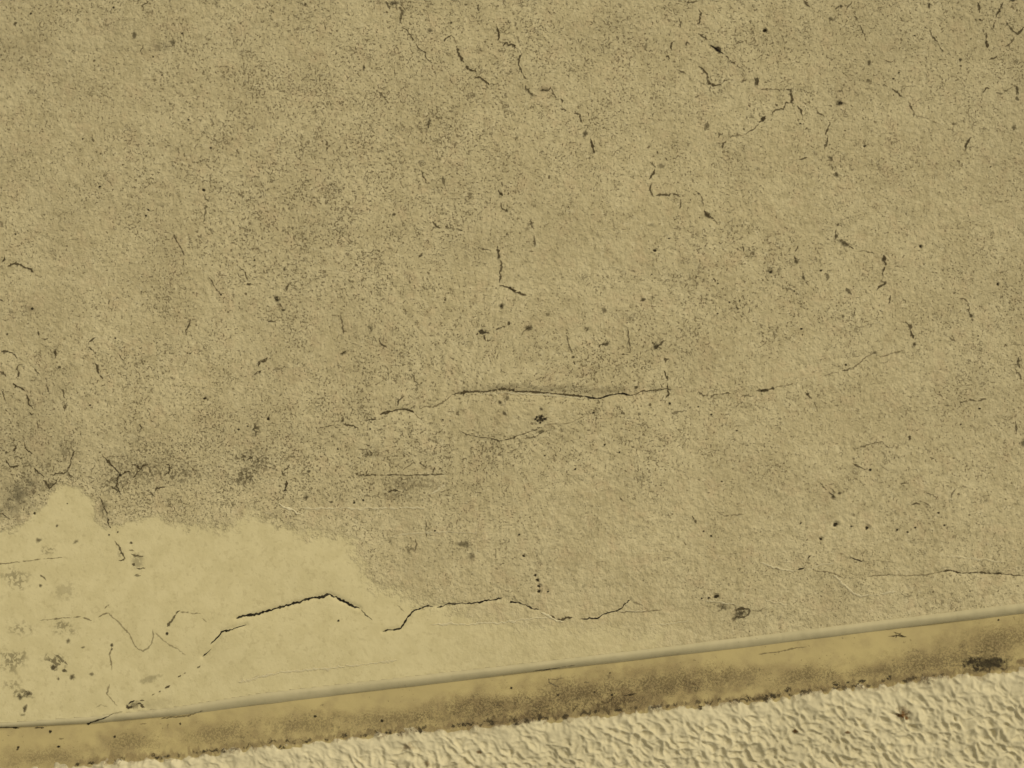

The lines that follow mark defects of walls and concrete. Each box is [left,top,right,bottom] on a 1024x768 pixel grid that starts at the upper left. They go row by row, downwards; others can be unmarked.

crack [320,358,671,441]
crack [152,593,658,725]
water stain [963,657,1024,673]